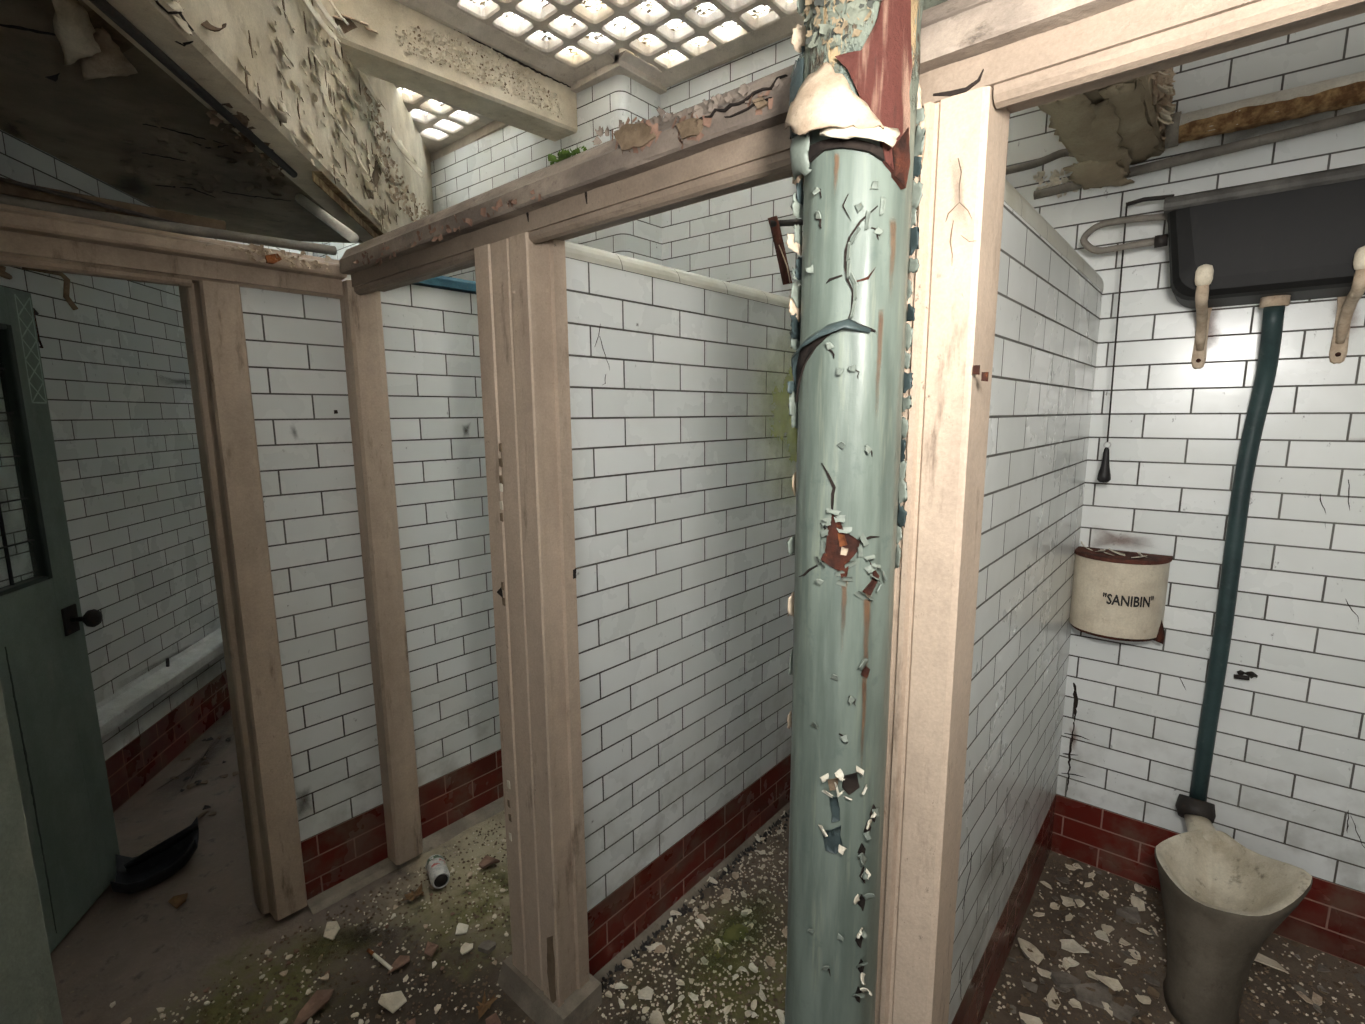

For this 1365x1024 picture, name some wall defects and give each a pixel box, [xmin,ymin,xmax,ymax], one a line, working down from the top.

crack [0,24,56,36]
peeling [45,0,138,82]
peeling [167,0,227,37]
peeling [206,0,541,266]
peeling [612,112,712,155]
spalling [1033,67,1176,198]
crack [826,194,886,319]
peeling [747,0,948,624]
crack [1062,683,1089,790]
peeling [818,766,880,911]
peeling [852,927,872,1003]